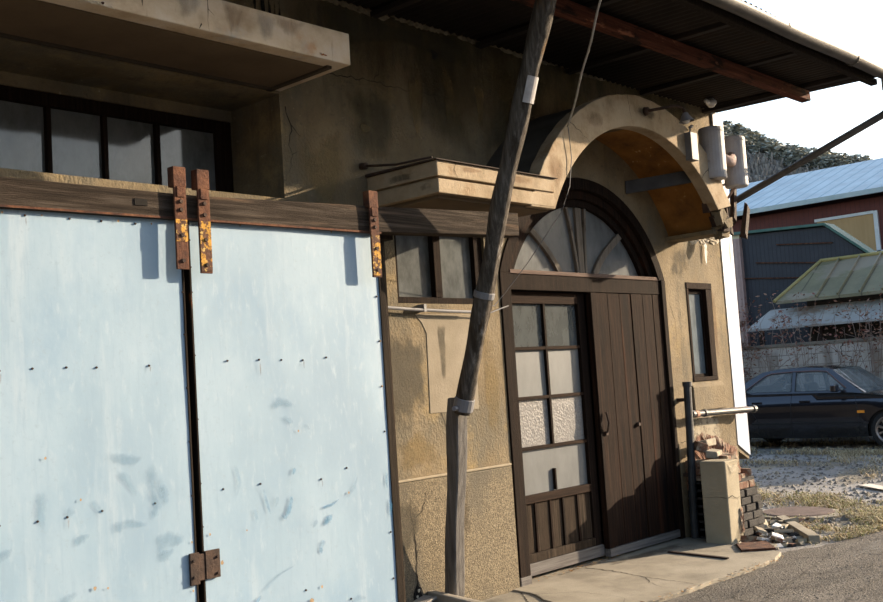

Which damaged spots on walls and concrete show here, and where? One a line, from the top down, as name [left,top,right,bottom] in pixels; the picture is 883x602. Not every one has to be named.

leakage [390,343,423,418]
spalling [695,431,739,466]
crack [410,492,426,584]